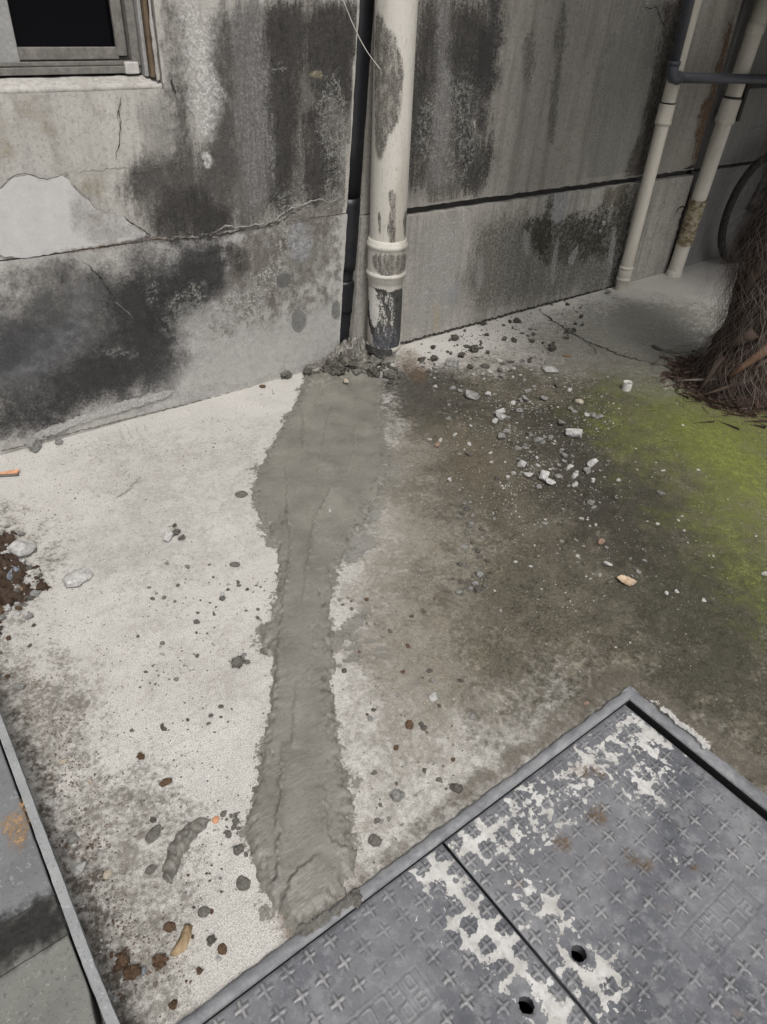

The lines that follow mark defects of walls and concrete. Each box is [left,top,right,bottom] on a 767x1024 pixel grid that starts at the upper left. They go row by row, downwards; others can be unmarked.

flaking render [0,171,342,258]
water stain [0,0,357,438]
water stain [374,0,506,202]
water stain [522,0,684,286]
peeling [368,286,403,356]
crack [400,284,673,369]
water stain [342,352,767,795]